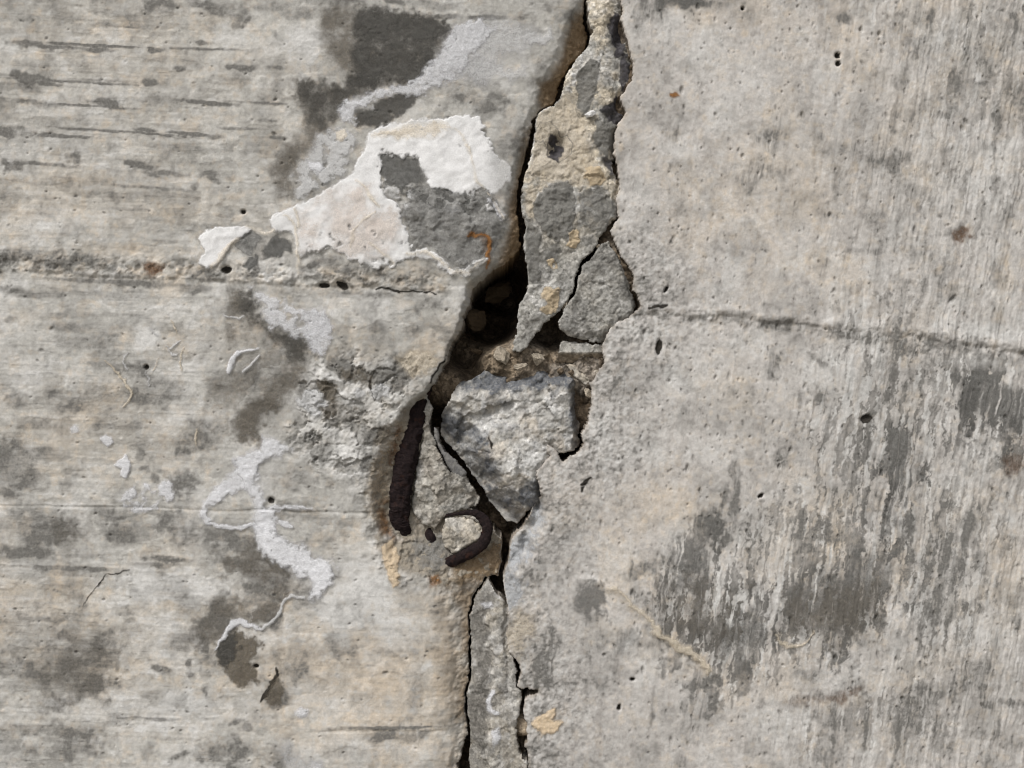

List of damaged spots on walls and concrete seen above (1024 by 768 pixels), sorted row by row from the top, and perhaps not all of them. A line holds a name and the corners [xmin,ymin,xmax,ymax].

leakage [270,6,553,199]
peeling [198,115,511,277]
leakage [199,290,338,651]
spalling [296,368,390,418]
spalling [398,351,437,377]
spalling [370,397,501,587]
crack [429,0,668,768]
leakage [873,422,931,538]
leakage [951,367,1024,462]
leakage [656,509,907,676]